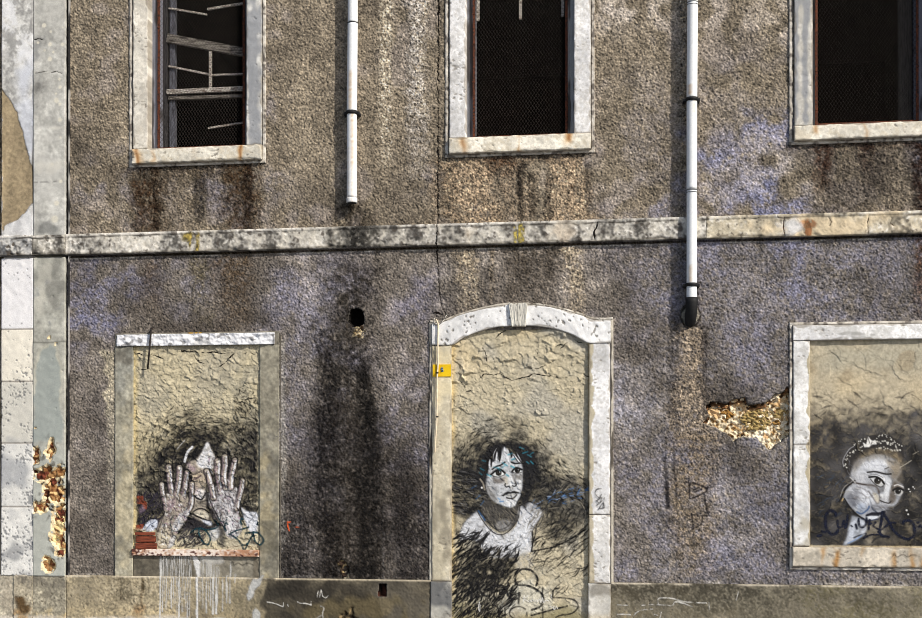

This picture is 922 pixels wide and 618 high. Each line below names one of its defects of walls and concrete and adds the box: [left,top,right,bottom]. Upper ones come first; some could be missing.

peeling [2,90,33,230]
crack [429,0,450,323]
rust [911,142,922,210]
leakage [328,204,376,248]
hole [342,308,366,349]
leakage [279,269,389,579]
spalling [703,387,789,450]
spalling [33,437,66,574]
leakage [396,498,429,580]